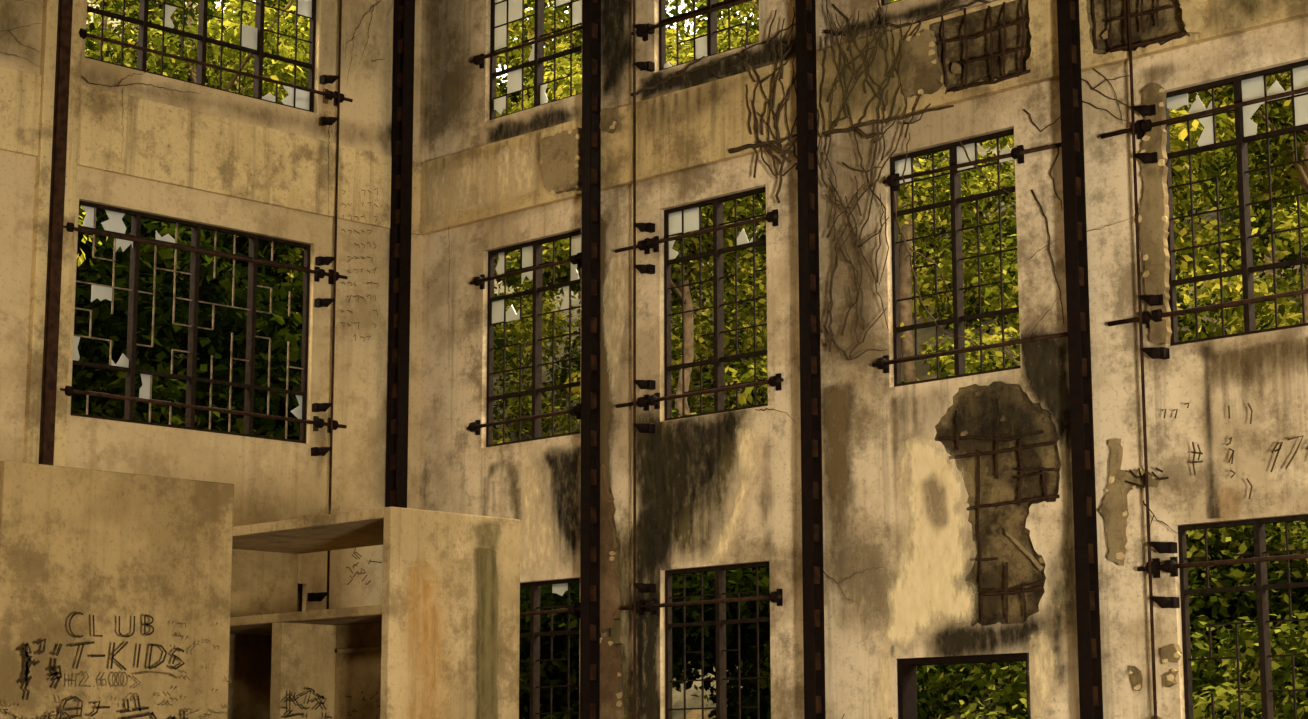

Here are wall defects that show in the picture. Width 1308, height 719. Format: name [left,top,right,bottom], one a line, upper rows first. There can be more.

leakage [637,37,796,117]
spalling [899,0,1032,97]
spalling [1086,0,1209,55]
leakage [600,219,626,492]
leakage [959,332,1071,486]
leakage [489,448,581,570]
leakage [601,410,761,719]
leakage [822,384,1076,719]
spalling [934,381,1062,627]
peeling [1099,438,1159,566]